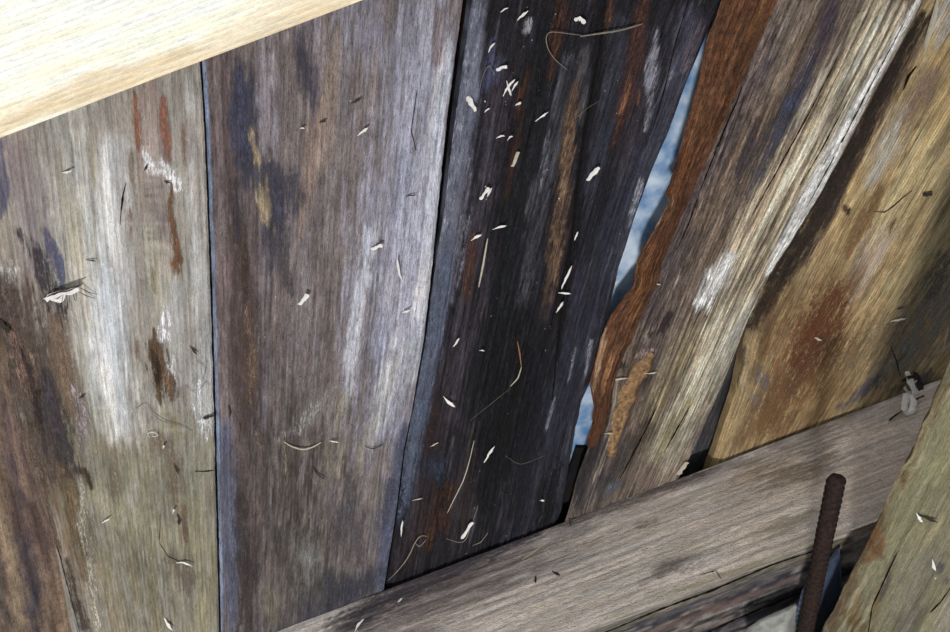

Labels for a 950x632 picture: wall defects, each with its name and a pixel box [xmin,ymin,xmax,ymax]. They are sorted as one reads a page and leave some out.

rust [129,91,141,182]
rust [159,96,186,163]
rust [168,183,183,275]
crack [676,87,742,250]
crack [753,60,837,214]
rust [737,276,891,444]